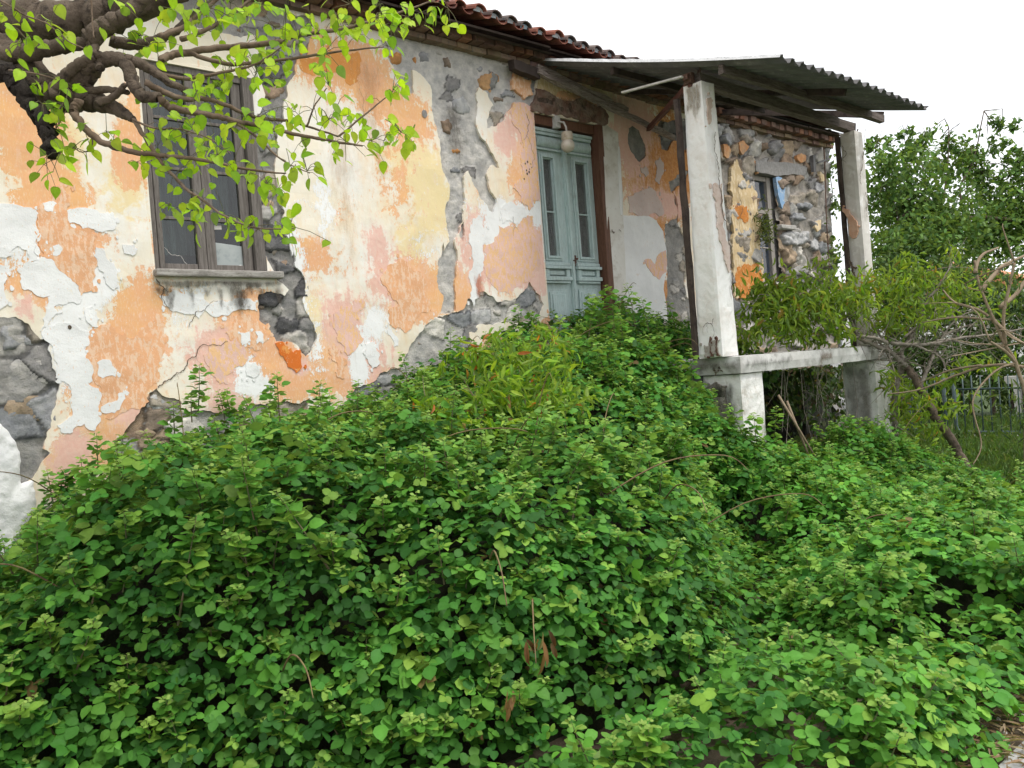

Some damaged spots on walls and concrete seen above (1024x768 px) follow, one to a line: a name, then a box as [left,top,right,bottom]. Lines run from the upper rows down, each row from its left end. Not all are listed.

spalling [0,0,362,483]
crack [158,301,226,388]
leakage [220,282,281,308]
spalling [328,35,549,411]
peeling [623,118,691,332]
peeling [709,183,731,273]